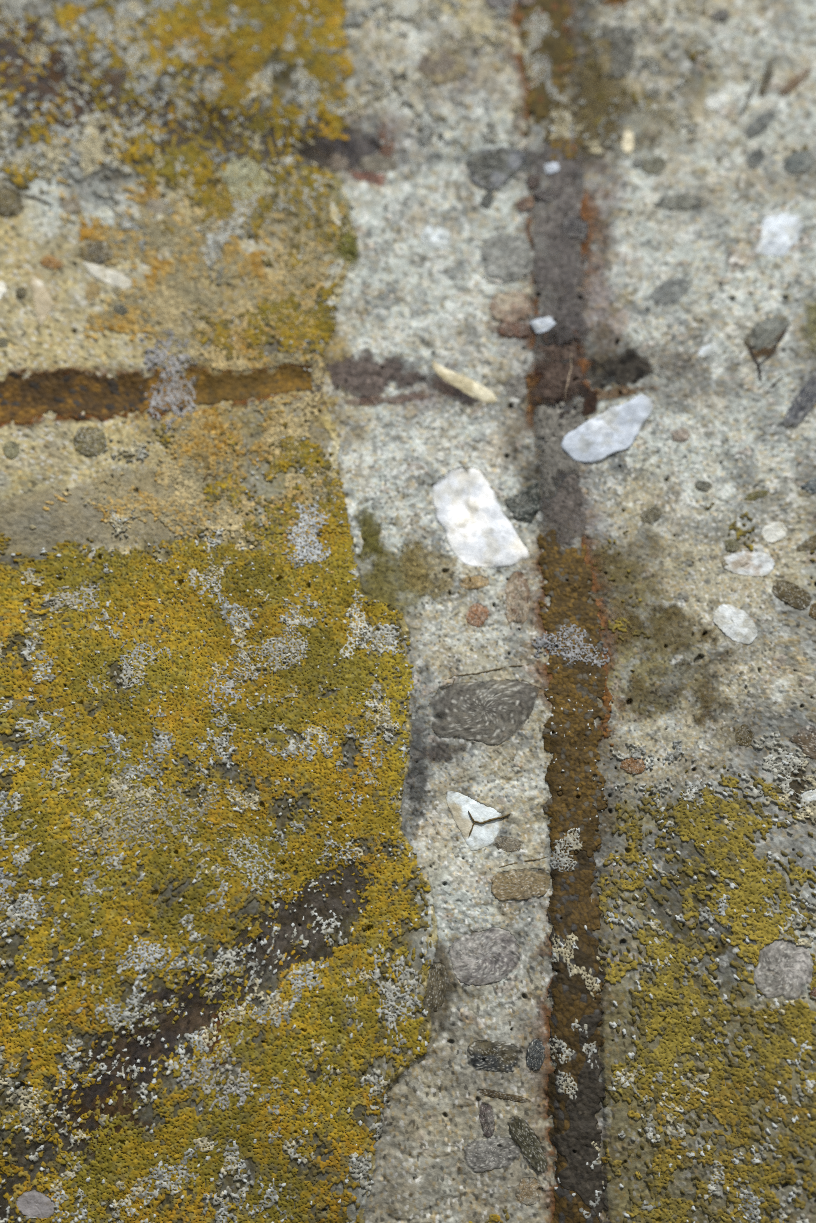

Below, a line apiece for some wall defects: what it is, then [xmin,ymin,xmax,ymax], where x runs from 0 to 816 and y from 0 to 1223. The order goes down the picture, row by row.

rust [0,349,479,427]
rust [511,0,653,1223]